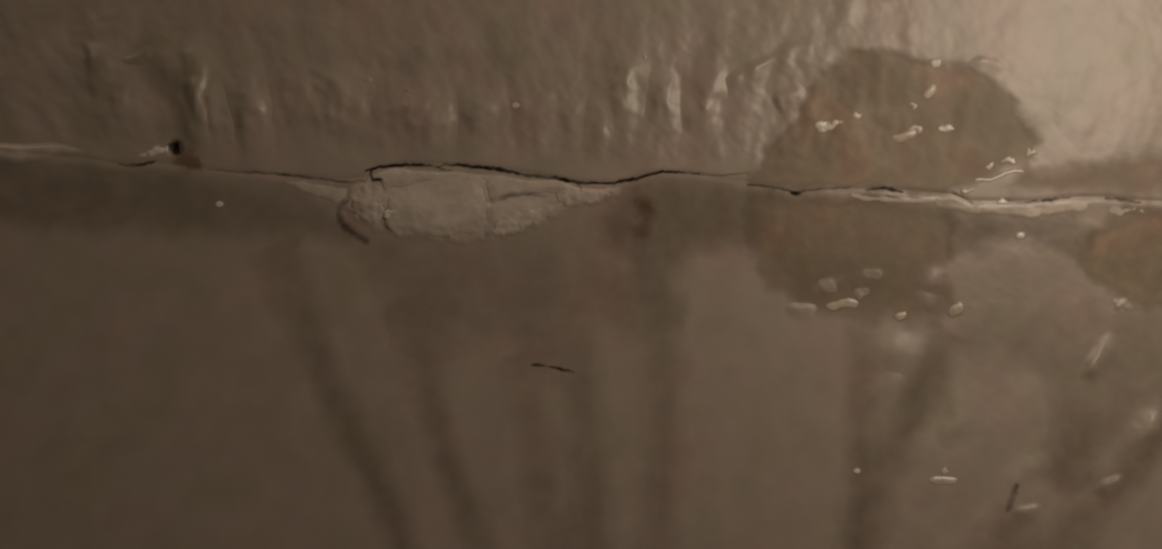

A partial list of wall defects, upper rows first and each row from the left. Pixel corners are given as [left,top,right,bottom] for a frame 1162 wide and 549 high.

peeling [278,166,623,247]
crack [366,163,699,184]